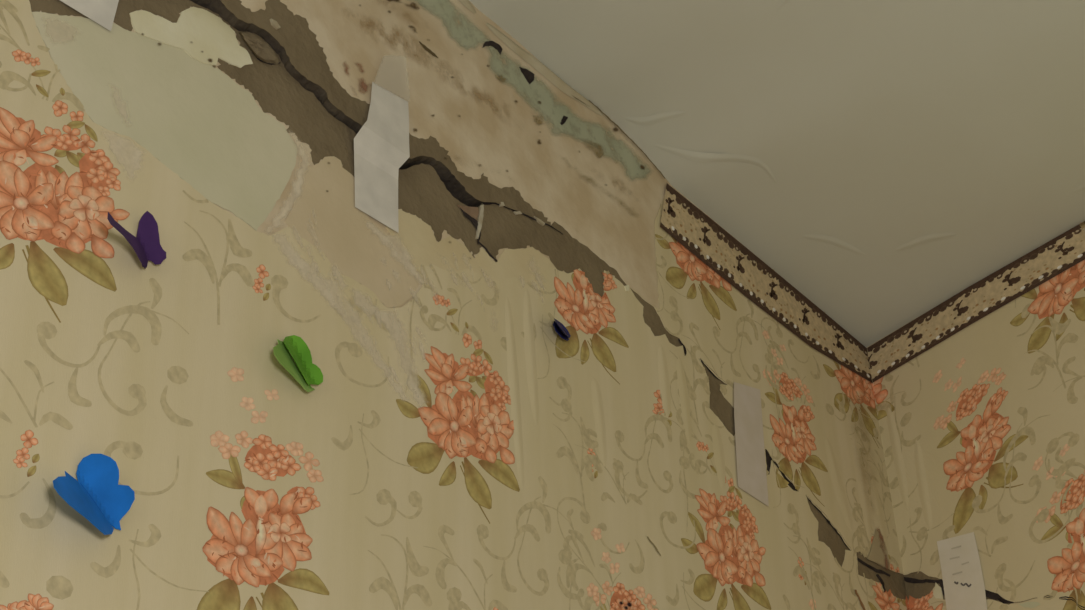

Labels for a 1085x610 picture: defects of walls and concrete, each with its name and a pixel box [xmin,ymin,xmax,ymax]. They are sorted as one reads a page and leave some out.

crack [190,0,362,134]
peeling [29,0,649,404]
crack [399,156,562,262]
crack [575,97,665,178]
crack [765,449,945,600]
crack [985,590,1085,610]